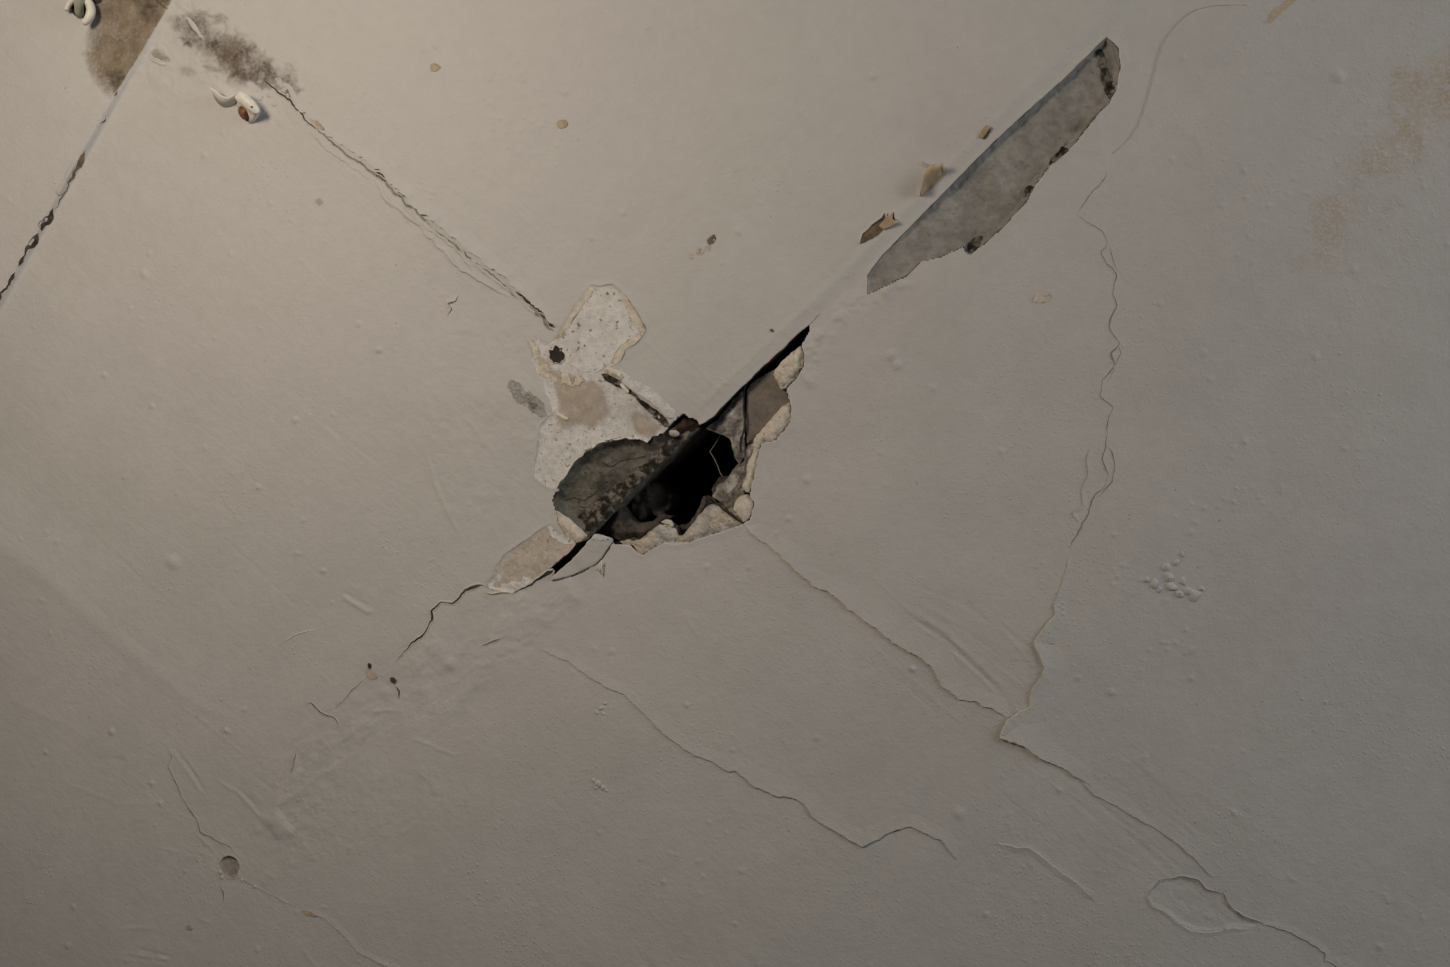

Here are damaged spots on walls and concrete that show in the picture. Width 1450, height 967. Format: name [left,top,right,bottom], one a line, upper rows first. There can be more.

damp [90,0,169,88]
damp [186,17,289,83]
crack [0,91,118,301]
crack [258,77,559,332]
spalling [857,34,1131,294]
spalling [486,279,820,595]
crack [1070,169,1122,550]
crack [305,569,555,729]
crack [166,746,297,907]
peeling [1144,874,1267,937]